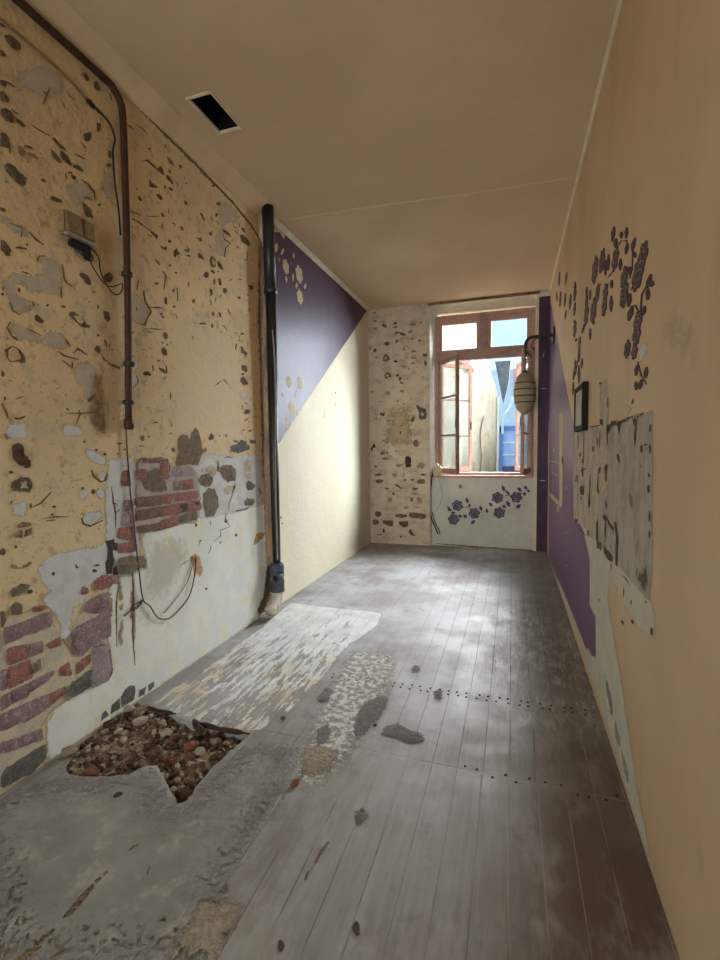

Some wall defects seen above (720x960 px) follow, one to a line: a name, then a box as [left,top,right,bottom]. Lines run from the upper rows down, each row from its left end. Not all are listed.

spalling [0,23,21,56]
peeling [0,65,114,218]
leakage [89,376,105,431]
spalling [369,312,427,422]
flaking render [0,144,263,794]
flaking render [371,444,426,484]
flaking render [372,497,426,538]
peeling [153,603,381,731]
peeling [548,380,665,910]